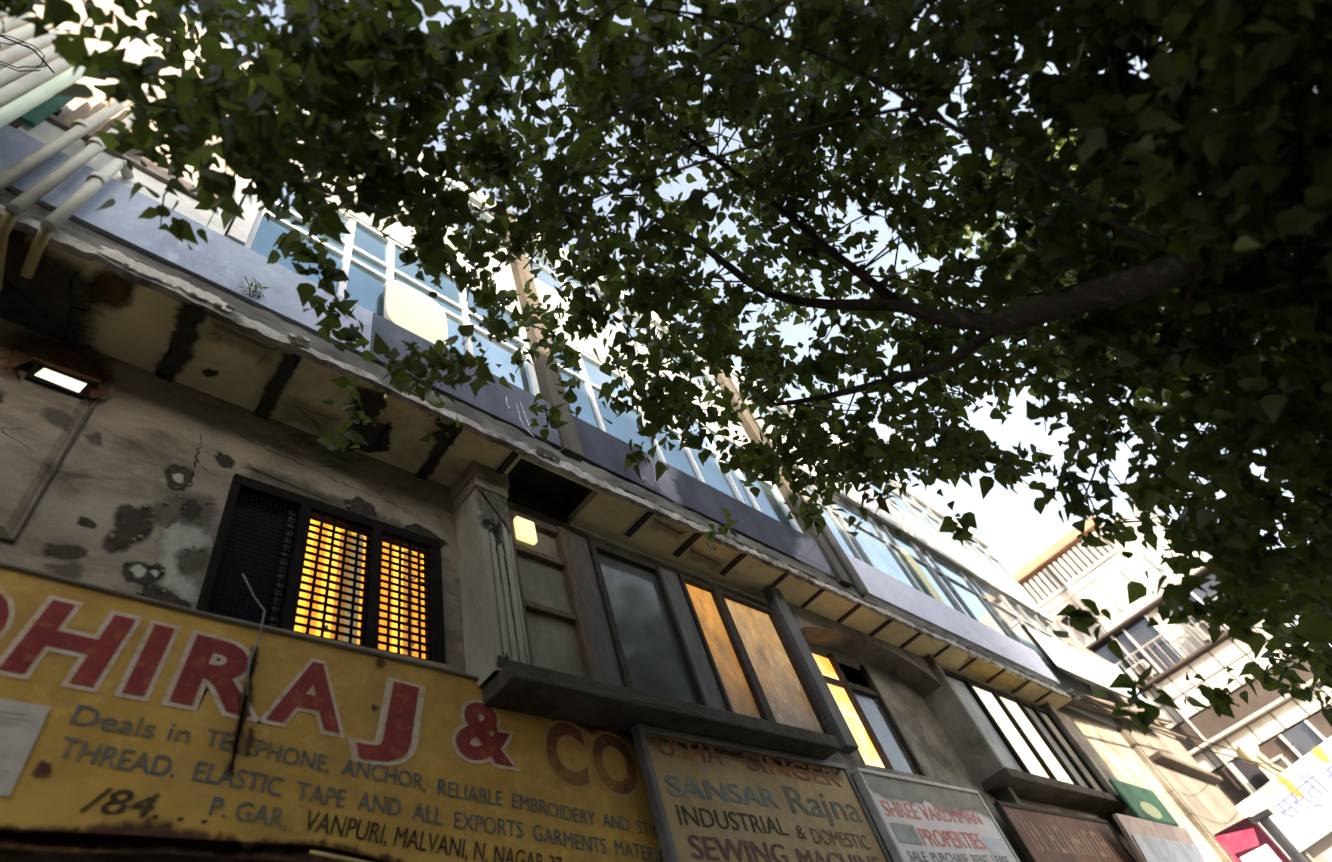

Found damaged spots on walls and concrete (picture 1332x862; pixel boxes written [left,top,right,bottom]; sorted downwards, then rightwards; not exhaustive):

damp [0,232,105,349]
damp [155,302,218,382]
damp [253,354,298,420]
peeling [77,464,215,608]